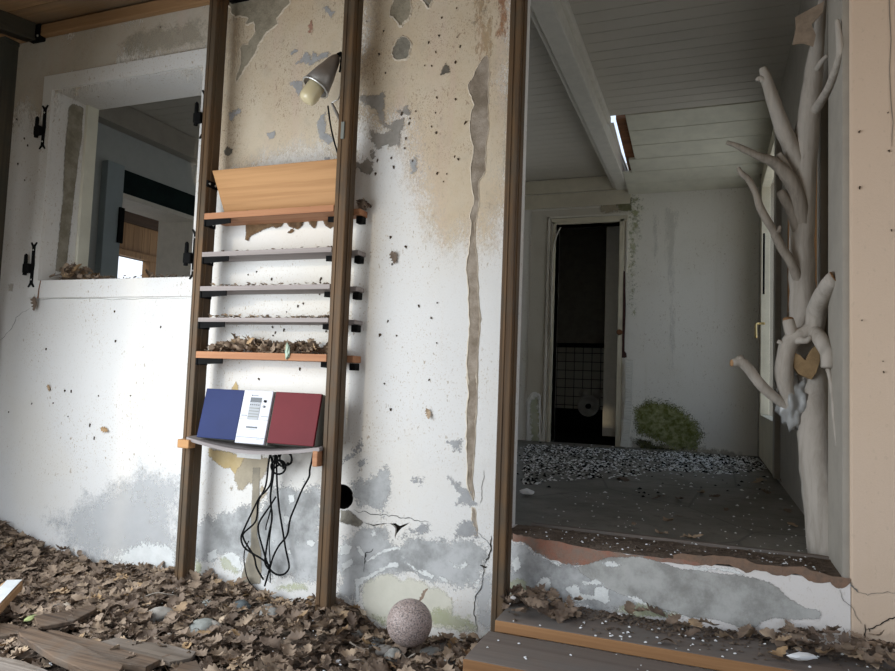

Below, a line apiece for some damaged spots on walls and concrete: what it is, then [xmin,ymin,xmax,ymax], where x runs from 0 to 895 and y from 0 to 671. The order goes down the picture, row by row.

flaking render [228,0,291,84]
flaking render [389,0,435,61]
peeling [356,92,411,175]
damp [360,0,510,243]
damp [111,539,176,568]
crack [355,510,428,526]
peeling [512,533,850,628]
crack [840,582,895,637]